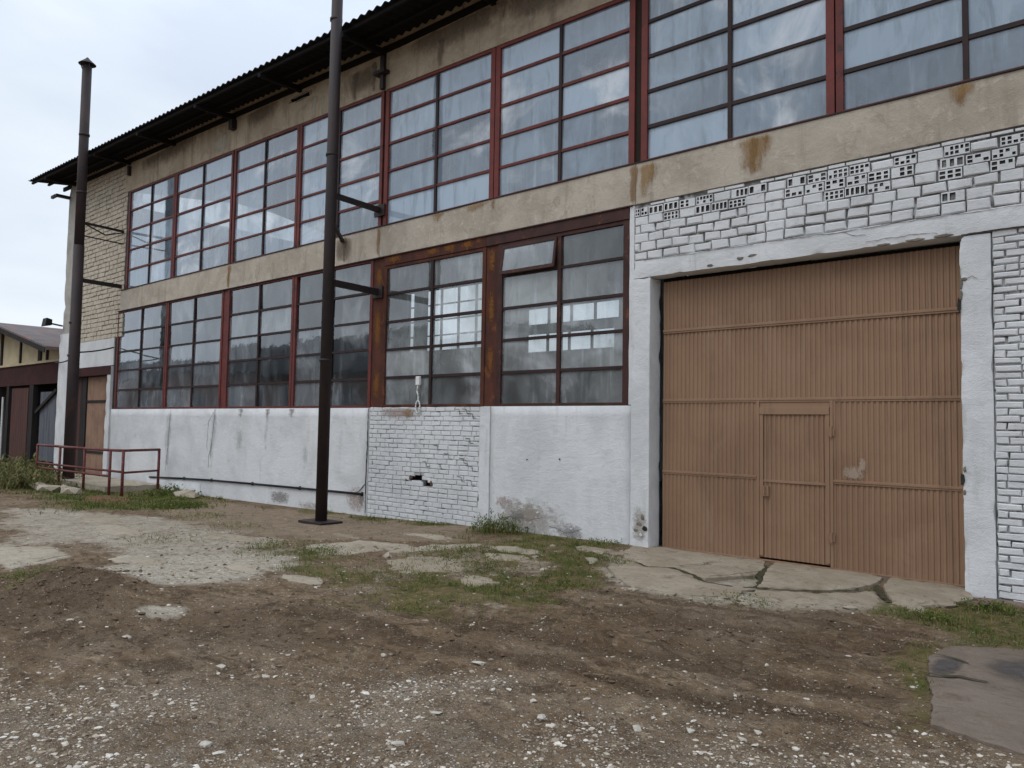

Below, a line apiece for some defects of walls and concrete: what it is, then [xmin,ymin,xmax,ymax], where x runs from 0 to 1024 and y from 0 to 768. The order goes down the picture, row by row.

corrosion [743,136,769,170]
corrosion [630,163,653,201]
spalling [405,445,476,487]
crack [637,562,891,602]